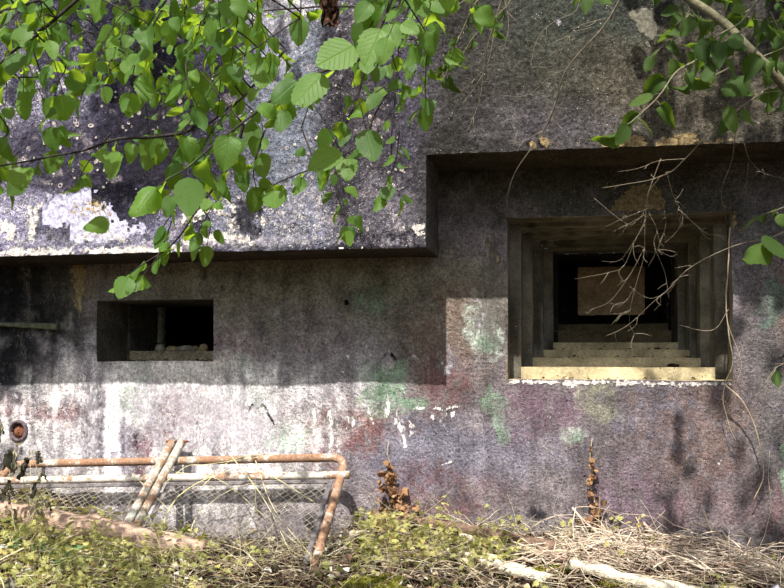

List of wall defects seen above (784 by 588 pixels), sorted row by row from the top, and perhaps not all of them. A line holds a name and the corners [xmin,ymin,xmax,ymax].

spalling [619,132,733,147]
corrosion [14,423,24,451]